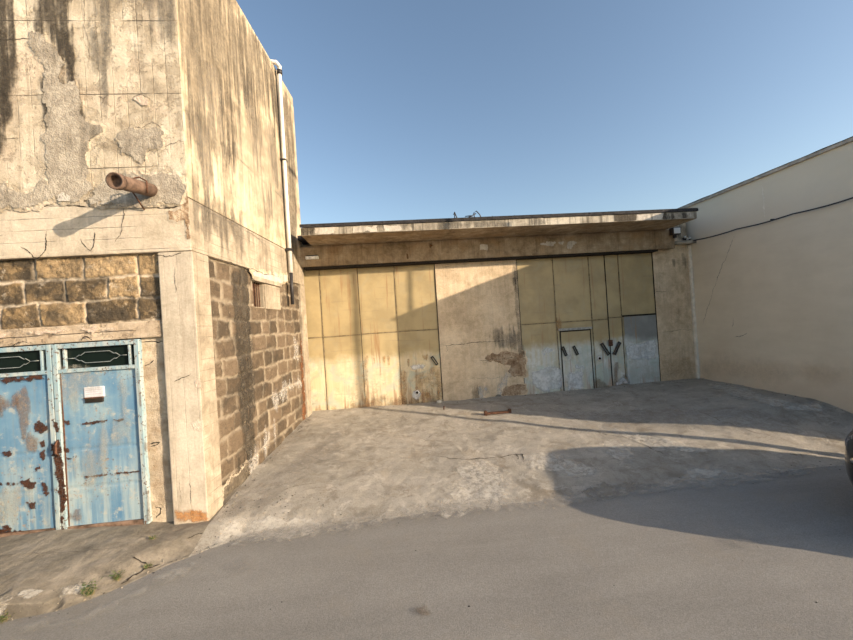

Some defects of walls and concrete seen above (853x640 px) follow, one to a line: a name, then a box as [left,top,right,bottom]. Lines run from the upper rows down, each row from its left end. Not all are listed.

damp [0,0,17,153]
damp [35,0,76,84]
spalling [0,30,191,244]
rust [1,375,44,384]
spalling [481,350,529,397]
rust [0,420,74,530]